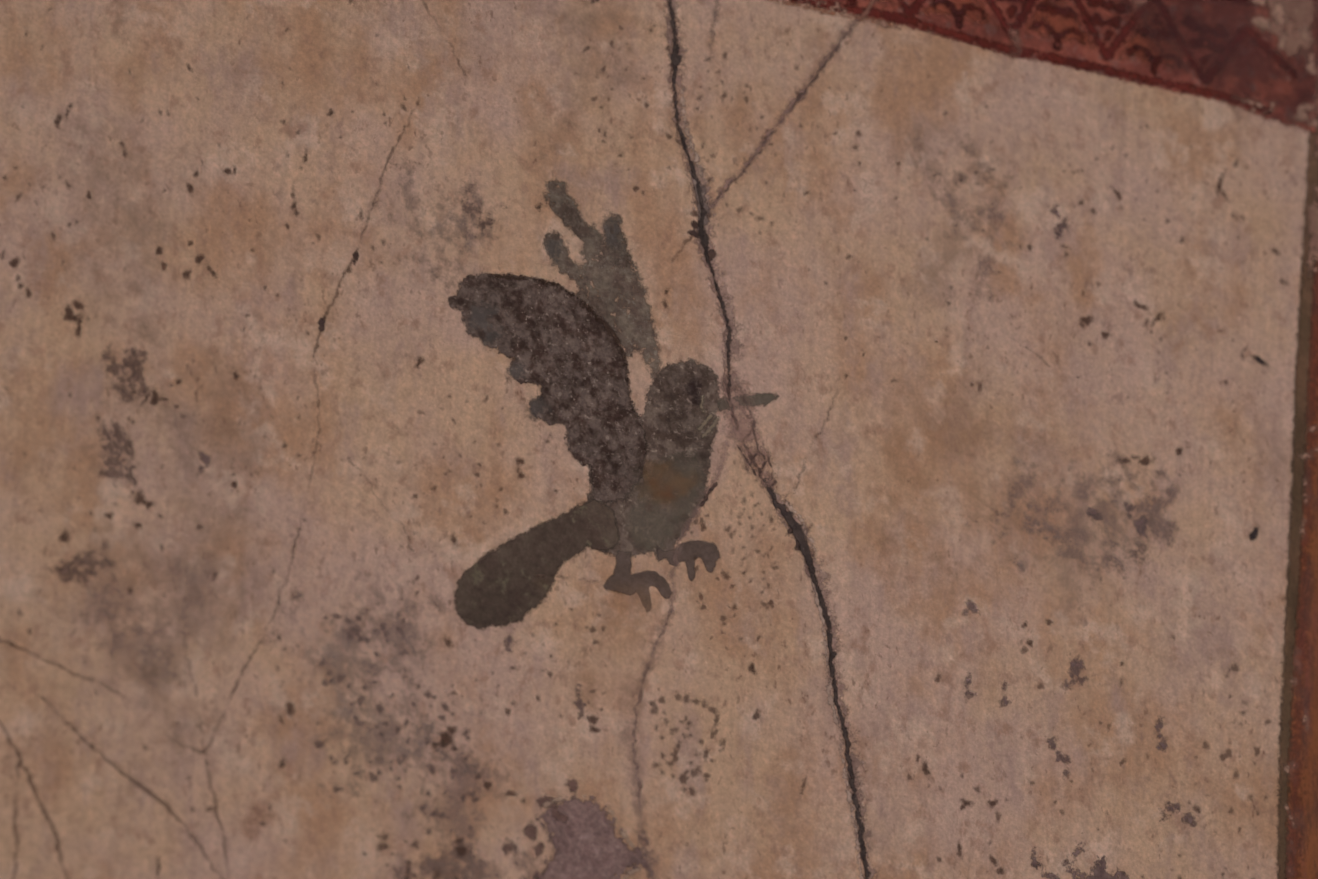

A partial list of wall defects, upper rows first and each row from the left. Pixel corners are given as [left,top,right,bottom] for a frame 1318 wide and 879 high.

peeling [1251,0,1318,74]
crack [318,317,326,331]
crack [665,0,877,879]